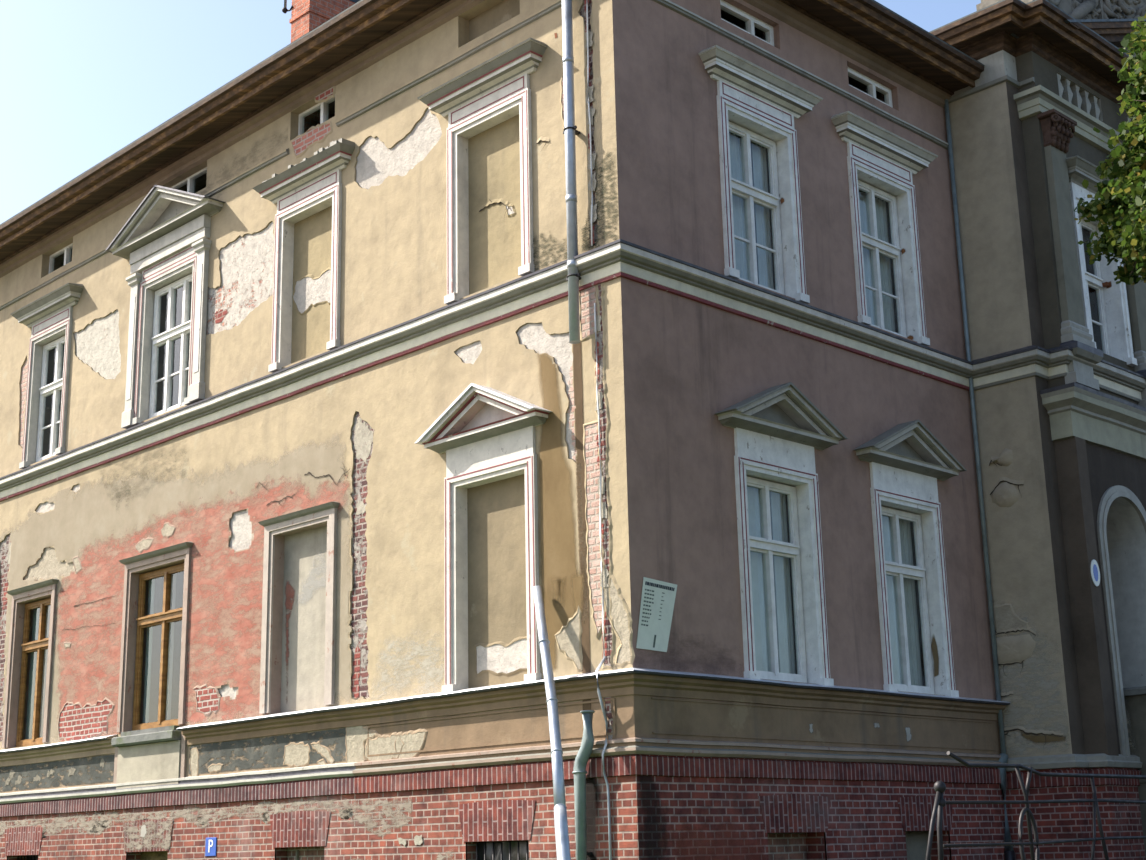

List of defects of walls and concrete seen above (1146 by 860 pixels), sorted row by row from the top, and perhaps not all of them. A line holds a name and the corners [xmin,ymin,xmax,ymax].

flaking render [354,108,442,189]
flaking render [206,221,274,335]
flaking render [73,309,121,379]
crack [256,464,350,507]
flaking render [516,285,635,671]
peeling [0,411,374,749]
flaking render [475,636,527,677]
peeling [0,754,115,792]
peeling [189,725,428,777]